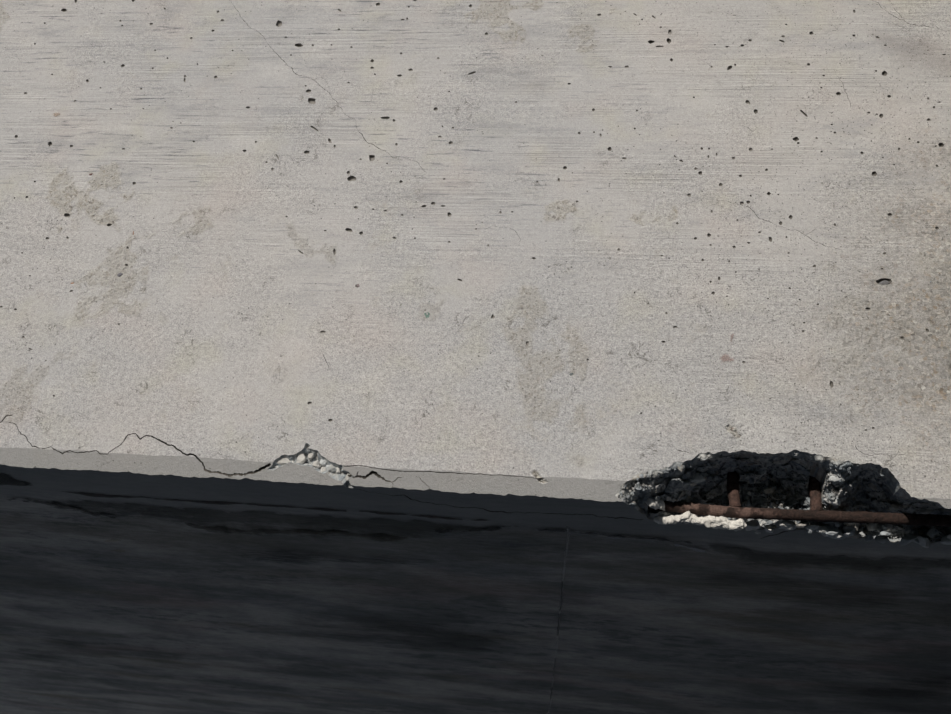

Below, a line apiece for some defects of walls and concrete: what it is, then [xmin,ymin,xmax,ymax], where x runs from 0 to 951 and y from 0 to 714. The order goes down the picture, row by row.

crack [0,415,271,477]
crack [344,465,643,520]
spalling [615,424,951,548]